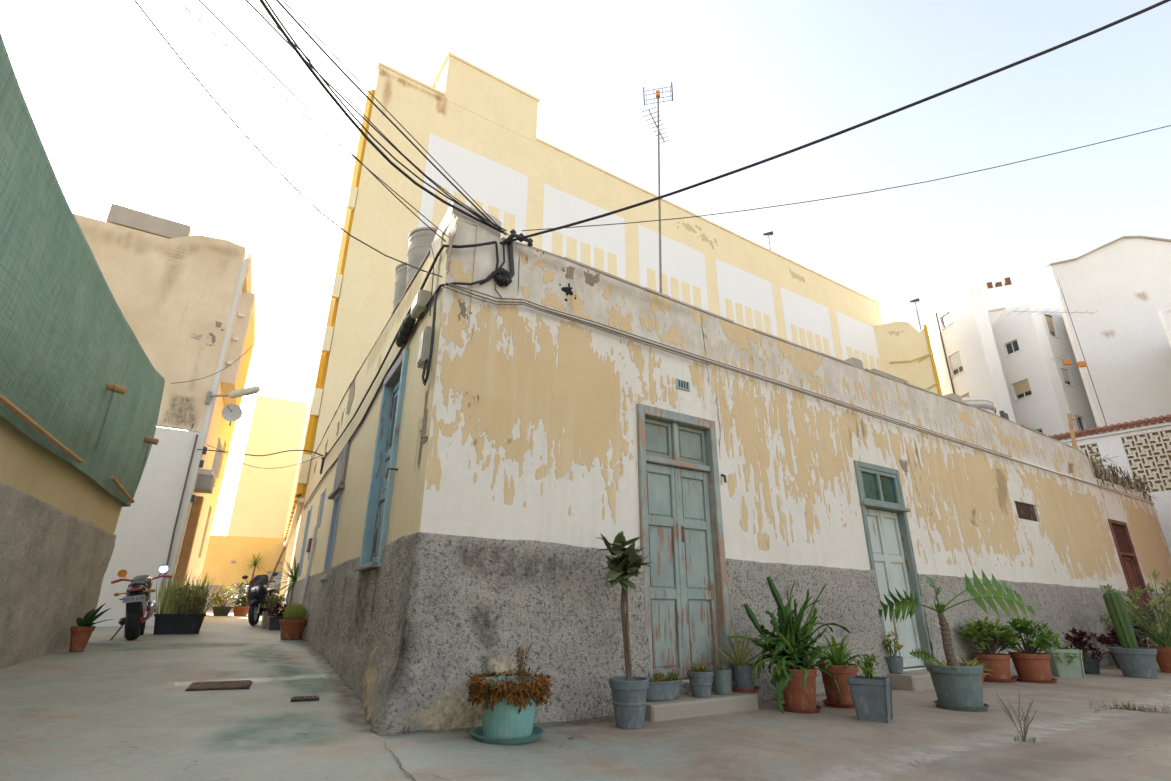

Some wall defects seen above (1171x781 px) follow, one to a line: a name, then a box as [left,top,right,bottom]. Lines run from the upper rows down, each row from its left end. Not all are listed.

spalling [314,378,356,473]
peeling [420,214,1171,585]